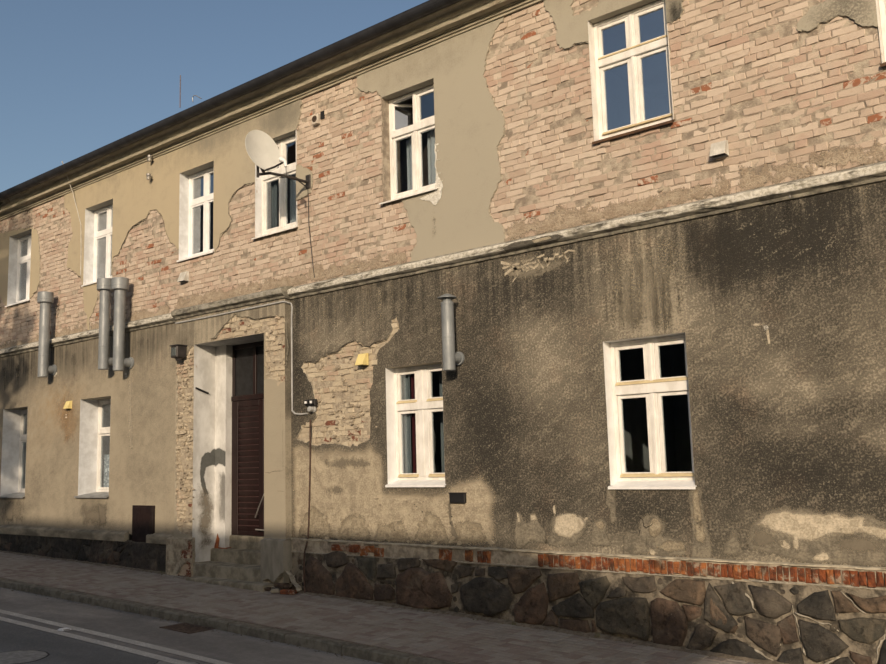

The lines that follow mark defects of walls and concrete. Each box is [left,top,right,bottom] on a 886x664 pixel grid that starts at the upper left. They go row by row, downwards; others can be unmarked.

flaking render [483,0,886,242]
flaking render [111,76,417,322]
flaking render [0,195,114,349]
water stain [501,249,575,282]
water stain [607,232,685,328]
flaking render [210,314,289,386]
flaking render [175,345,197,577]
peeling [292,317,495,546]
flaking render [514,505,612,549]
flaking render [623,513,686,557]
water stain [692,490,705,544]
flaking render [723,504,886,567]